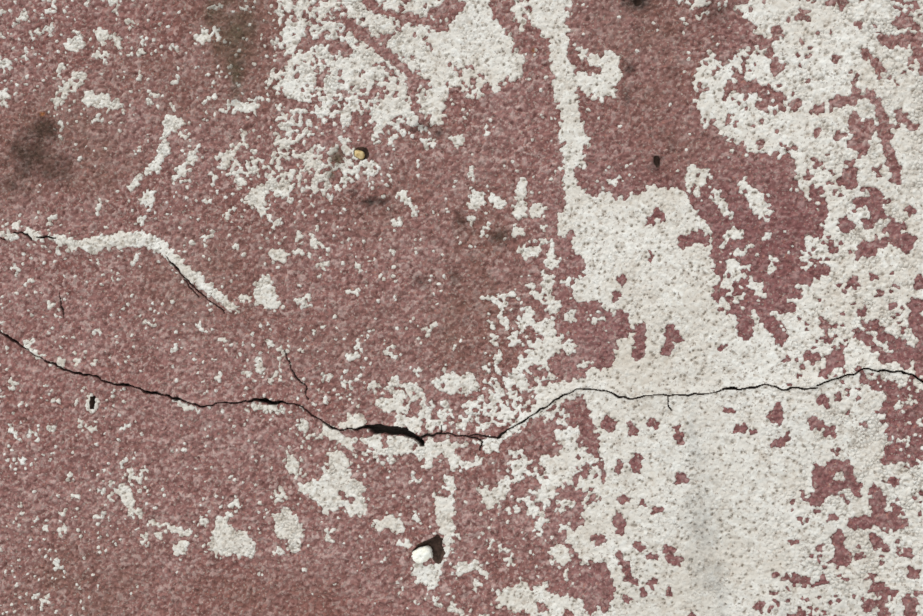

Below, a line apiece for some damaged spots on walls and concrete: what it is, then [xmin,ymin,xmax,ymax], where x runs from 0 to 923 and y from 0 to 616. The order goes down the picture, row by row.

peeling [193,28,214,45]
crack [58,292,66,319]
peeling [207,0,923,616]
crack [0,330,923,451]